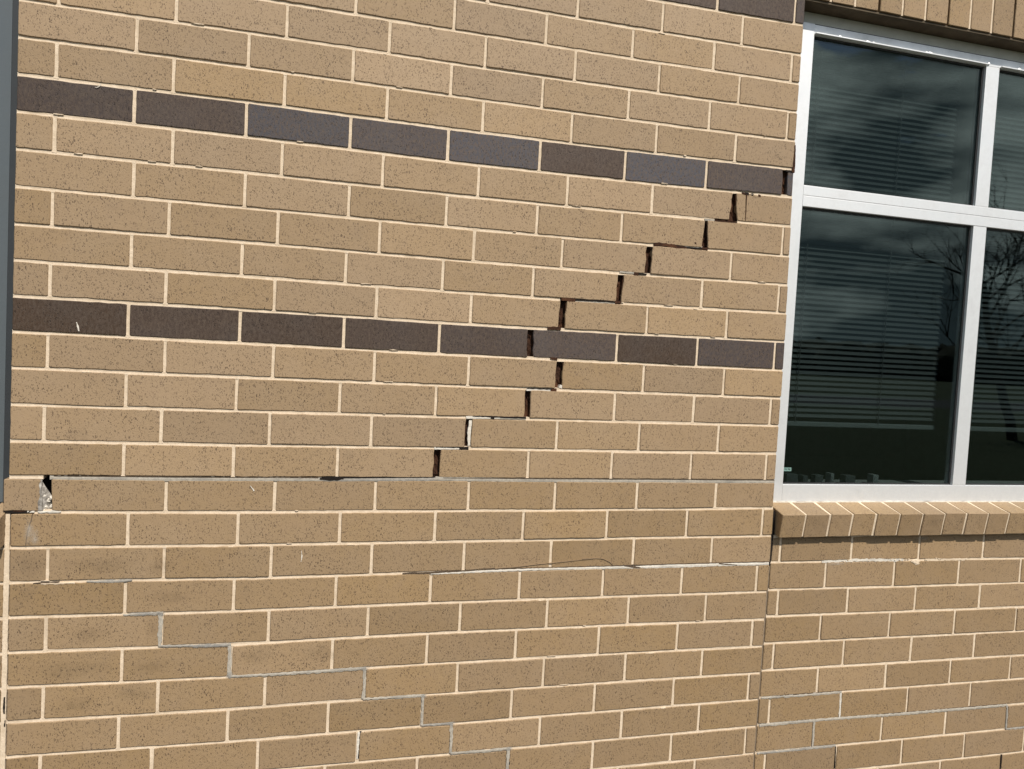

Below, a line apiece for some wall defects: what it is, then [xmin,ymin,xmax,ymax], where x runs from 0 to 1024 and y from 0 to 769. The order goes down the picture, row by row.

crack [55,145,796,481]
crack [481,475,745,483]
crack [403,510,775,575]
crack [354,731,362,759]